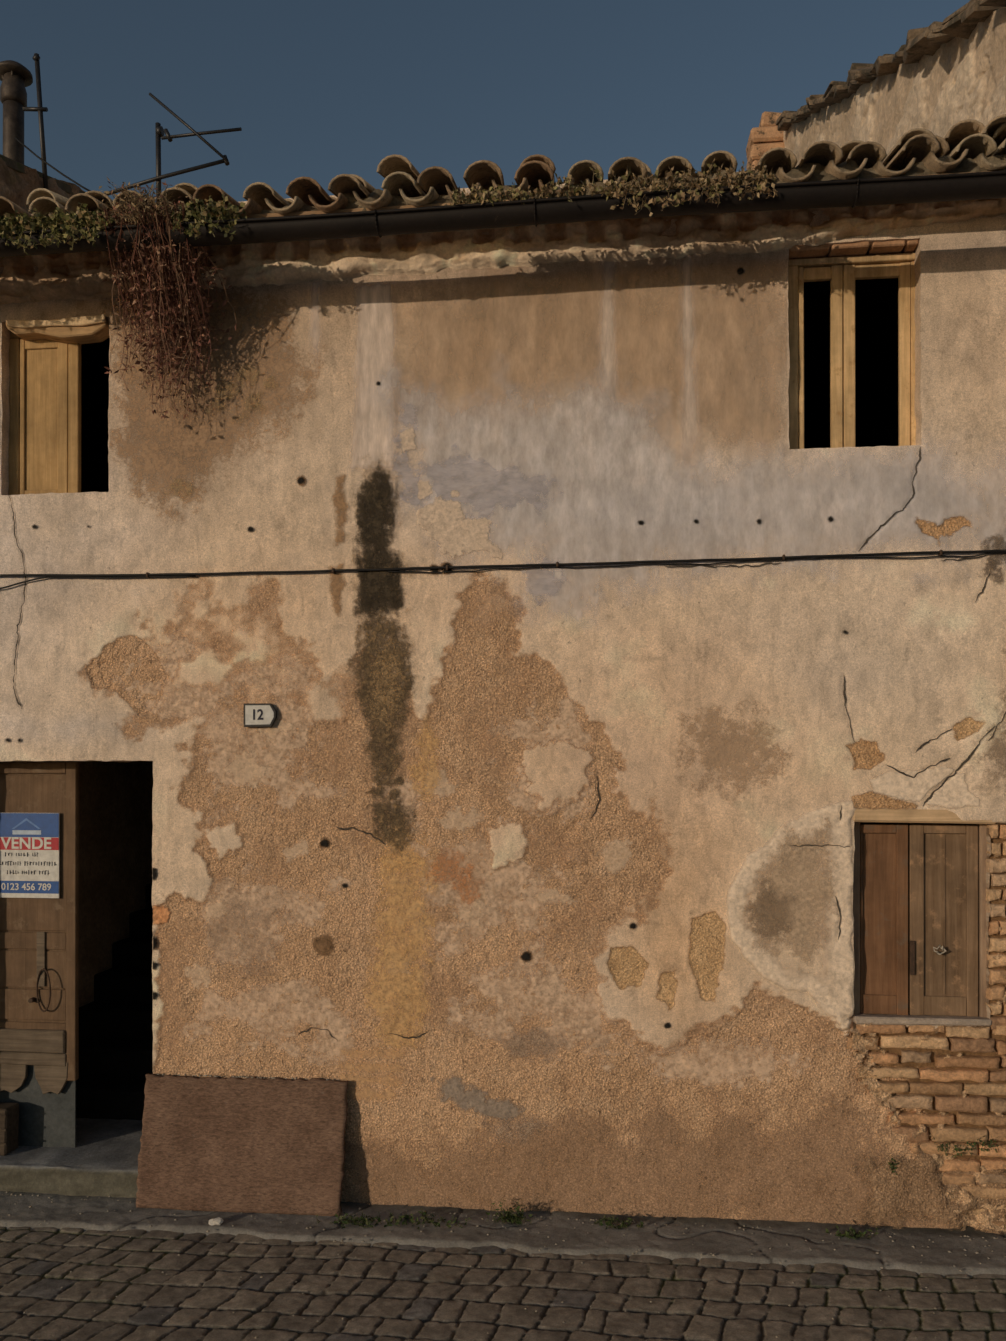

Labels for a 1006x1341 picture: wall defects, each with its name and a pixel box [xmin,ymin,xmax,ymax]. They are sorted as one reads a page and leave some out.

crack [8,494,26,709]
water stain [105,286,320,517]
water stain [329,286,416,851]
peeling [400,390,1006,616]
crack [664,561,779,569]
crack [858,447,921,552]
crack [941,555,991,602]
crack [843,677,855,742]
crack [887,712,1006,806]
spalling [80,573,1006,1235]